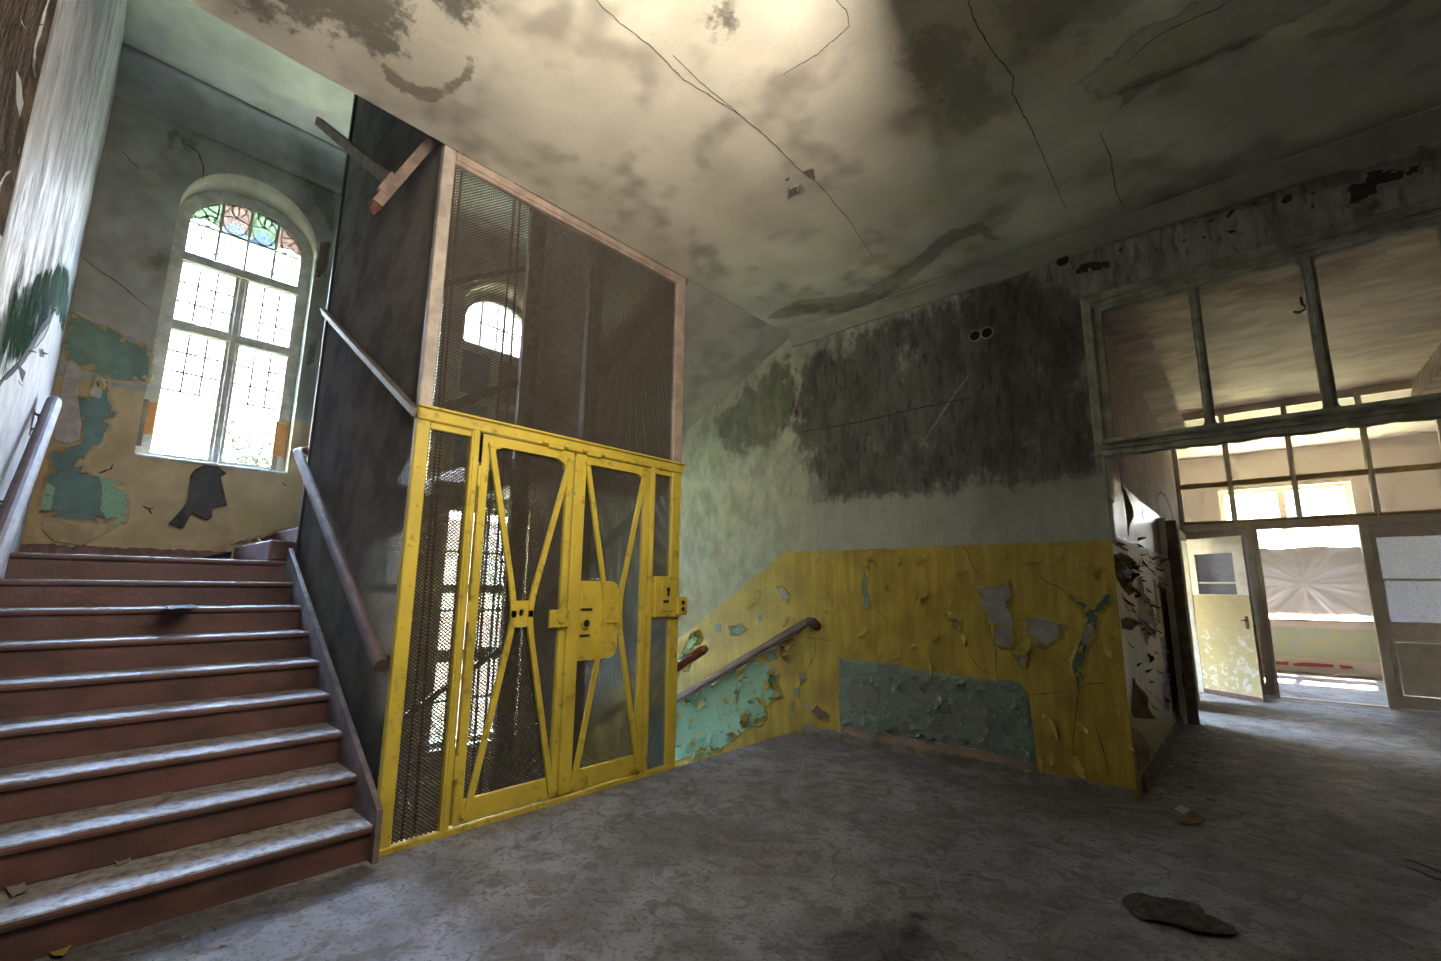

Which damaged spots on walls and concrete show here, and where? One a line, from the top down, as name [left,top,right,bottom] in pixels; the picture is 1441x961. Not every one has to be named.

spalling [0,0,50,185]
crack [596,0,872,255]
crack [968,0,1067,209]
crack [1100,133,1125,209]
peeling [0,308,154,546]